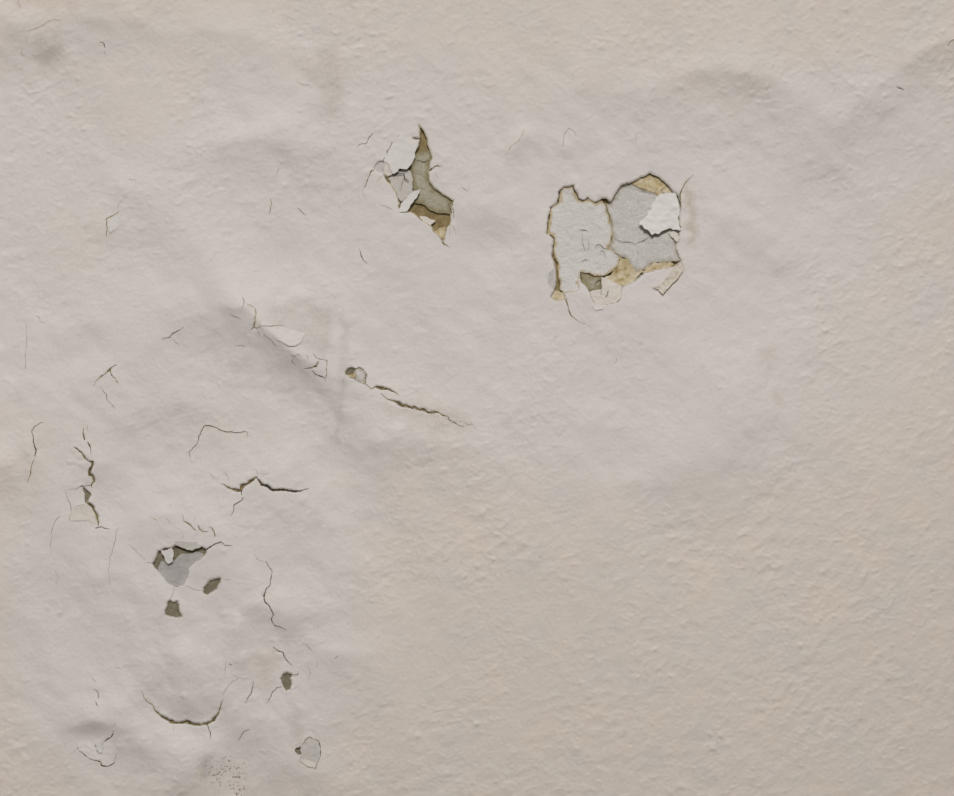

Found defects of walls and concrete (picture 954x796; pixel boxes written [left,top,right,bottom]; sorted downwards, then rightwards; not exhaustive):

peeling [362,124,456,247]
peeling [545,172,693,324]
crack [230,297,327,380]
crack [189,425,248,458]
crack [382,394,476,428]
crack [148,514,215,536]
crack [221,471,309,513]
peeling [129,531,232,618]
crack [253,554,338,668]
crack [142,663,253,739]